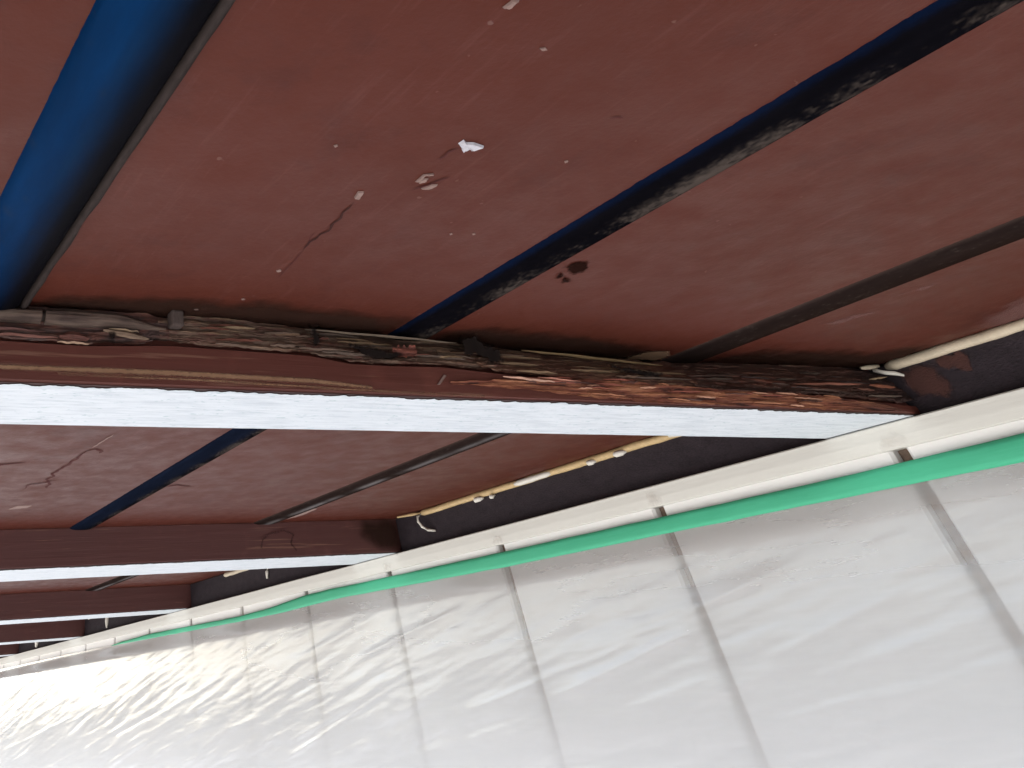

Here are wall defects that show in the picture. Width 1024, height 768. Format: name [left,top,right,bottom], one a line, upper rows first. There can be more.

peeling [458,140,484,152]
peeling [415,173,438,190]
crack [280,202,354,276]
water stain [557,262,588,283]
peeling [0,365,382,391]
peeling [450,376,900,411]
crack [23,435,113,490]